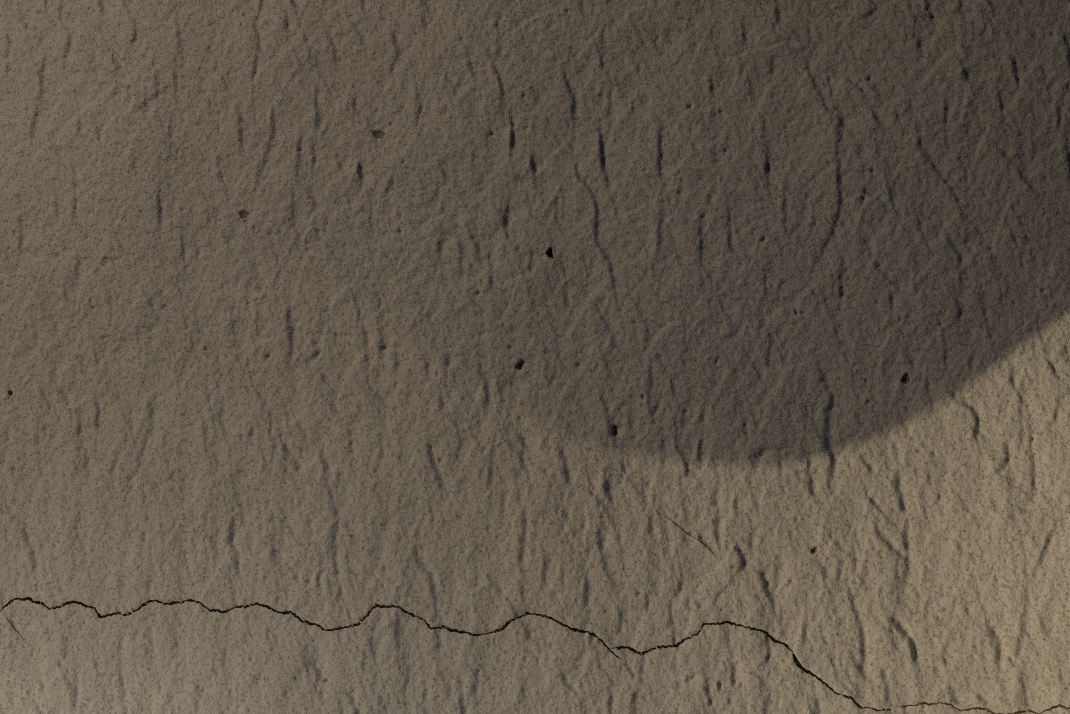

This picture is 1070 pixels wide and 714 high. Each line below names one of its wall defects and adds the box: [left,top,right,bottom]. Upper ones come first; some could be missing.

crack [0,597,1070,714]